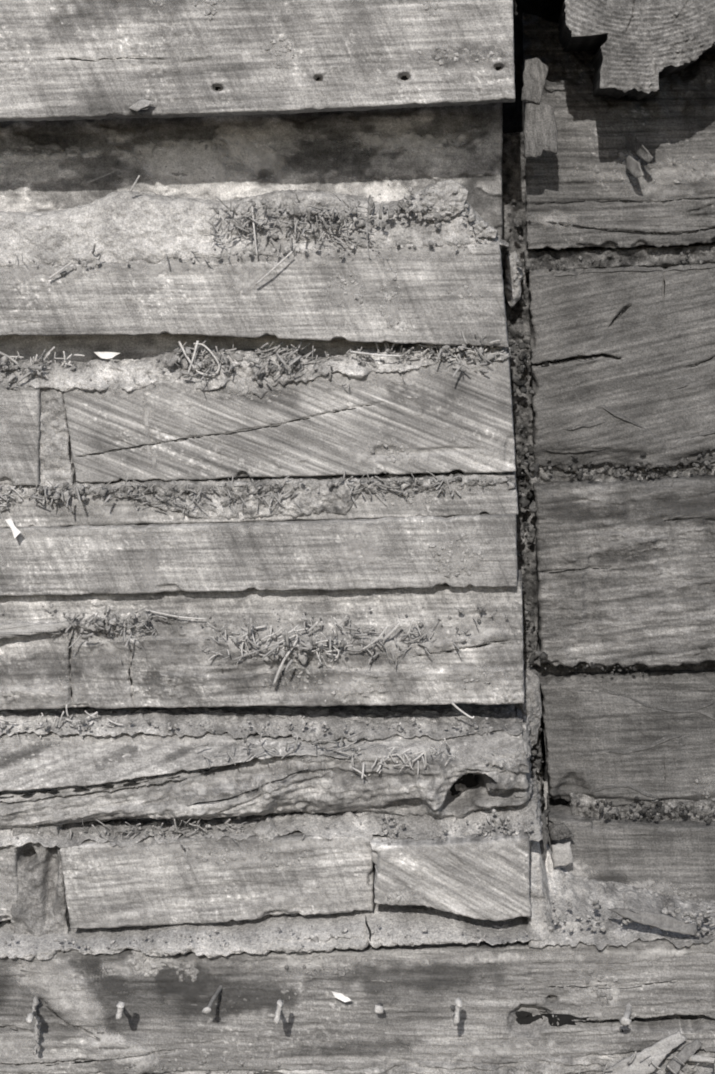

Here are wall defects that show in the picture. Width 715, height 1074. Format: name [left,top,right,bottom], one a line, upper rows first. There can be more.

crack [76,404,375,457]
crack [0,764,233,798]
crack [189,769,309,806]